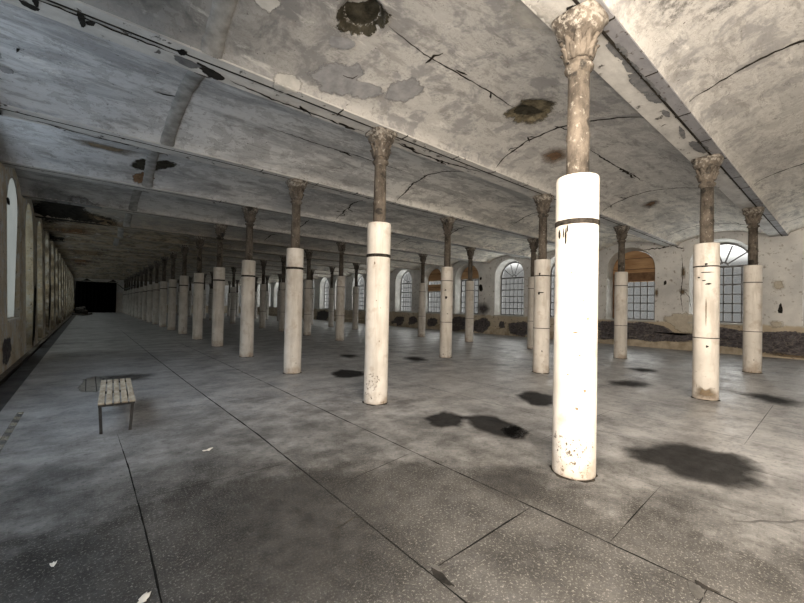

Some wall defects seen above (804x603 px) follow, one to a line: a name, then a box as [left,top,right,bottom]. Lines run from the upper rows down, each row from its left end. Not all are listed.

hole [330,0,391,49]
crack [390,27,515,108]
crack [689,40,804,102]
crack [230,80,364,132]
spalling [504,99,556,124]
crack [269,125,567,200]
flaking render [598,321,614,340]
flaking render [627,312,693,342]
flaking render [762,331,804,357]
water stain [518,392,553,406]
water stain [425,412,528,439]
water stain [628,445,761,487]